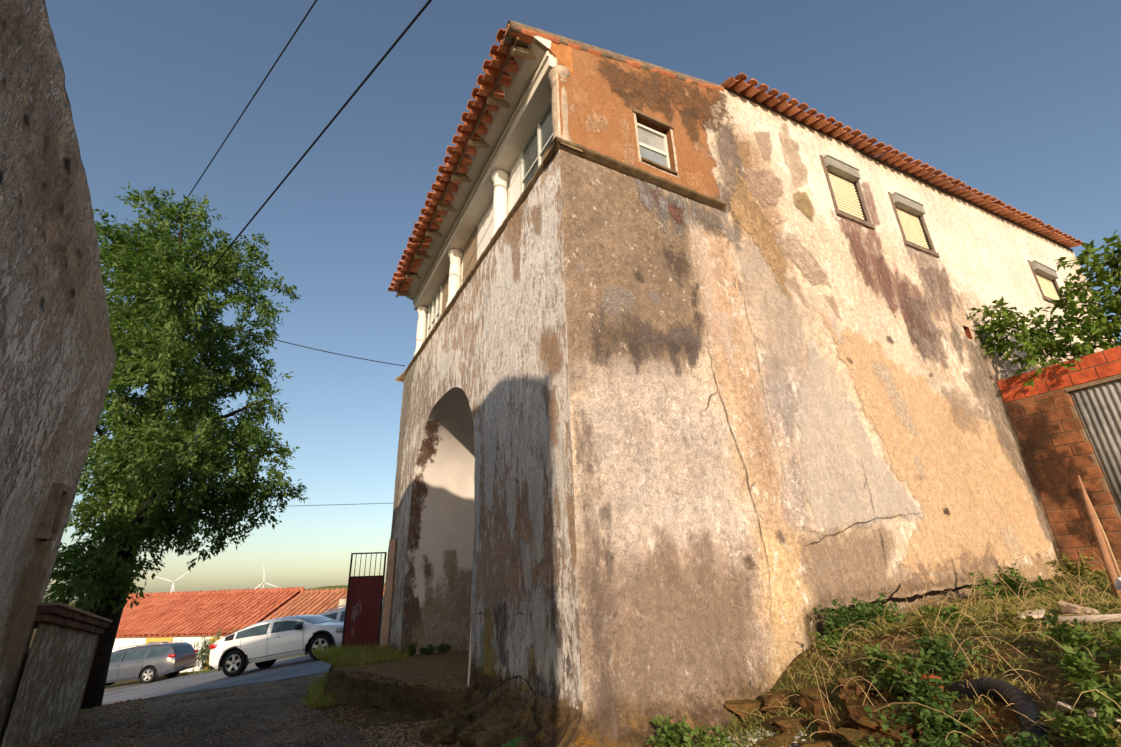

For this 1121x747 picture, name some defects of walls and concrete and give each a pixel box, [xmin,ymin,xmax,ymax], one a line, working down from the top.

leakage [597,58,745,276]
peeling [469,175,579,709]
leakage [593,281,735,378]
crack [799,463,999,613]
leakage [832,182,1113,558]